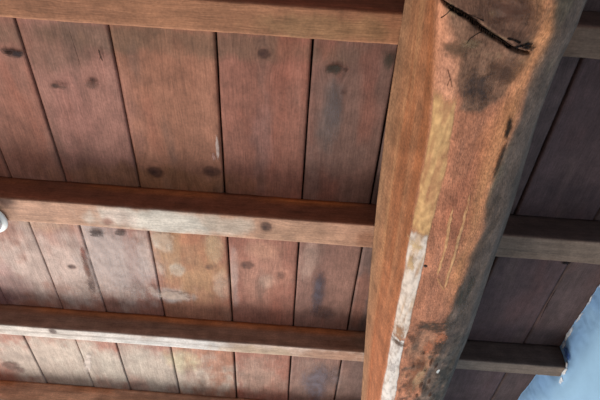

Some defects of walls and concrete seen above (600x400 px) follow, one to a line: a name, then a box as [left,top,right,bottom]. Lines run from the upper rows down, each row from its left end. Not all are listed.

crack [441,0,536,51]
peeling [381,97,455,400]
water stain [417,323,448,354]